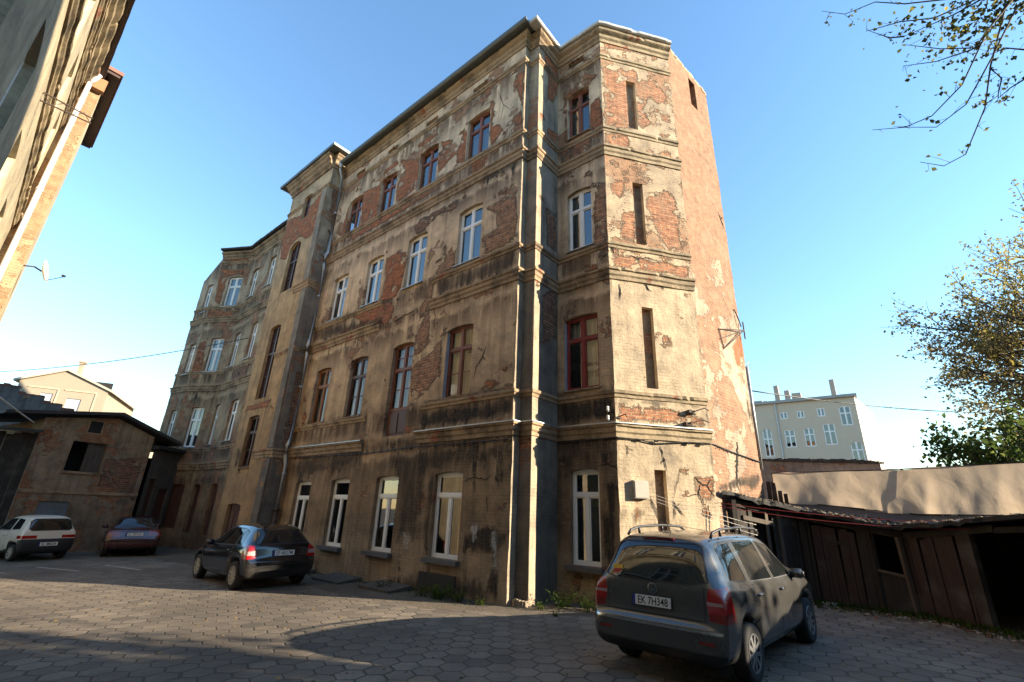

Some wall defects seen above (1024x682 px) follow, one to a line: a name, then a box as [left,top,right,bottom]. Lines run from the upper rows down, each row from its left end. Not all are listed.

spalling [488,68,525,154]
spalling [539,43,679,170]
spalling [280,122,468,267]
spalling [482,187,518,254]
spalling [581,159,690,278]
spalling [339,251,407,334]
spalling [407,243,459,412]
water stain [421,401,508,430]
spalling [617,403,705,427]
spalling [680,467,717,520]
water stain [451,525,505,600]